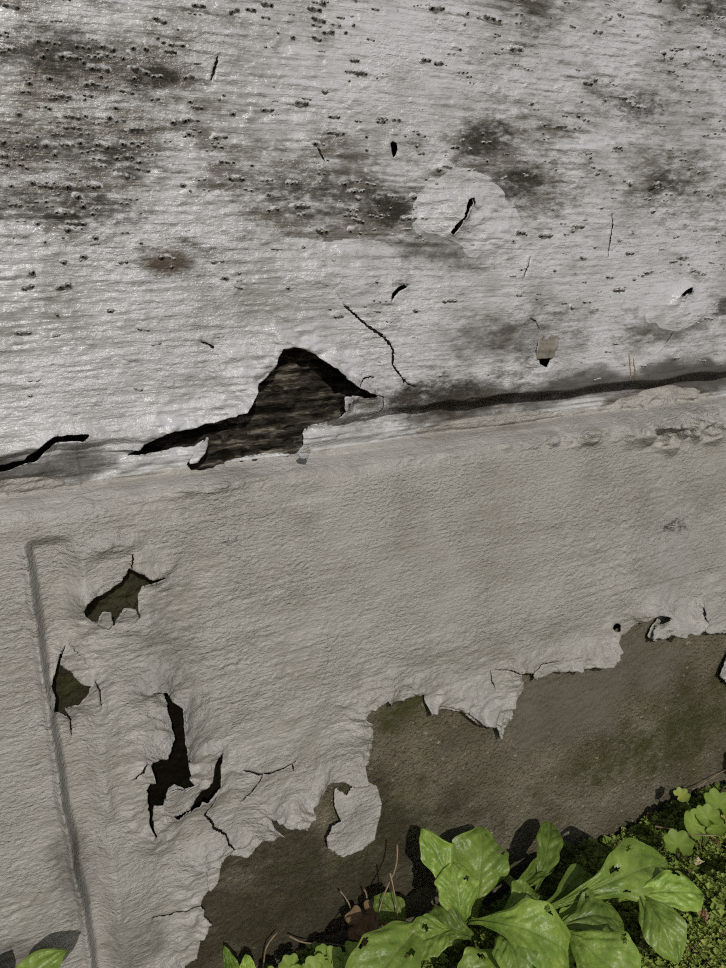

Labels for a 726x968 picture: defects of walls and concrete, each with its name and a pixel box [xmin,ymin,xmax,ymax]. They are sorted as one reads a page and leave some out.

water stain [368,199,409,226]
peeling [128,348,378,470]
crack [342,303,416,416]
peeling [84,569,165,630]
peeling [52,644,91,716]
peeling [147,692,223,838]
peeling [186,597,726,968]